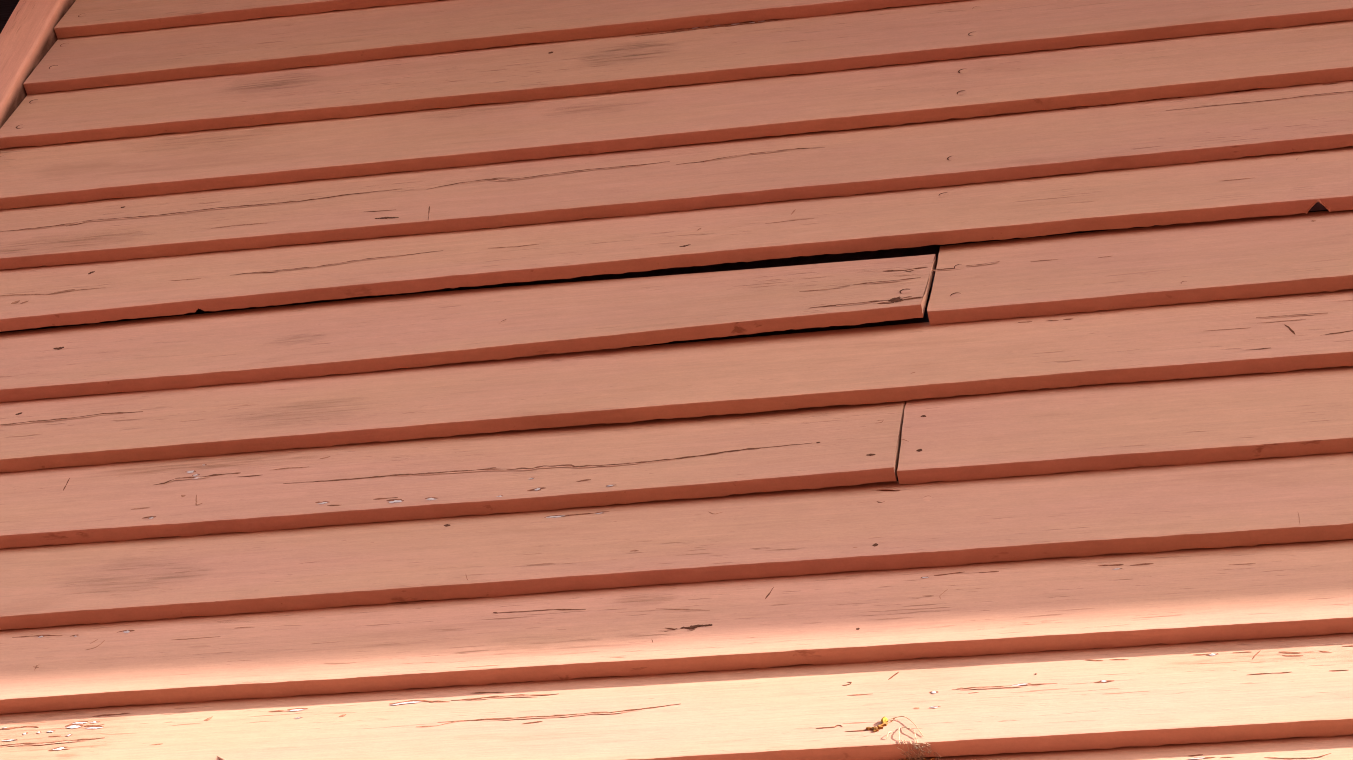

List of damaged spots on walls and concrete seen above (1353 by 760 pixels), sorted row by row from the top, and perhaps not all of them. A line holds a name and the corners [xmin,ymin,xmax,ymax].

crack [134,443,808,509]
peeling [2,713,127,751]